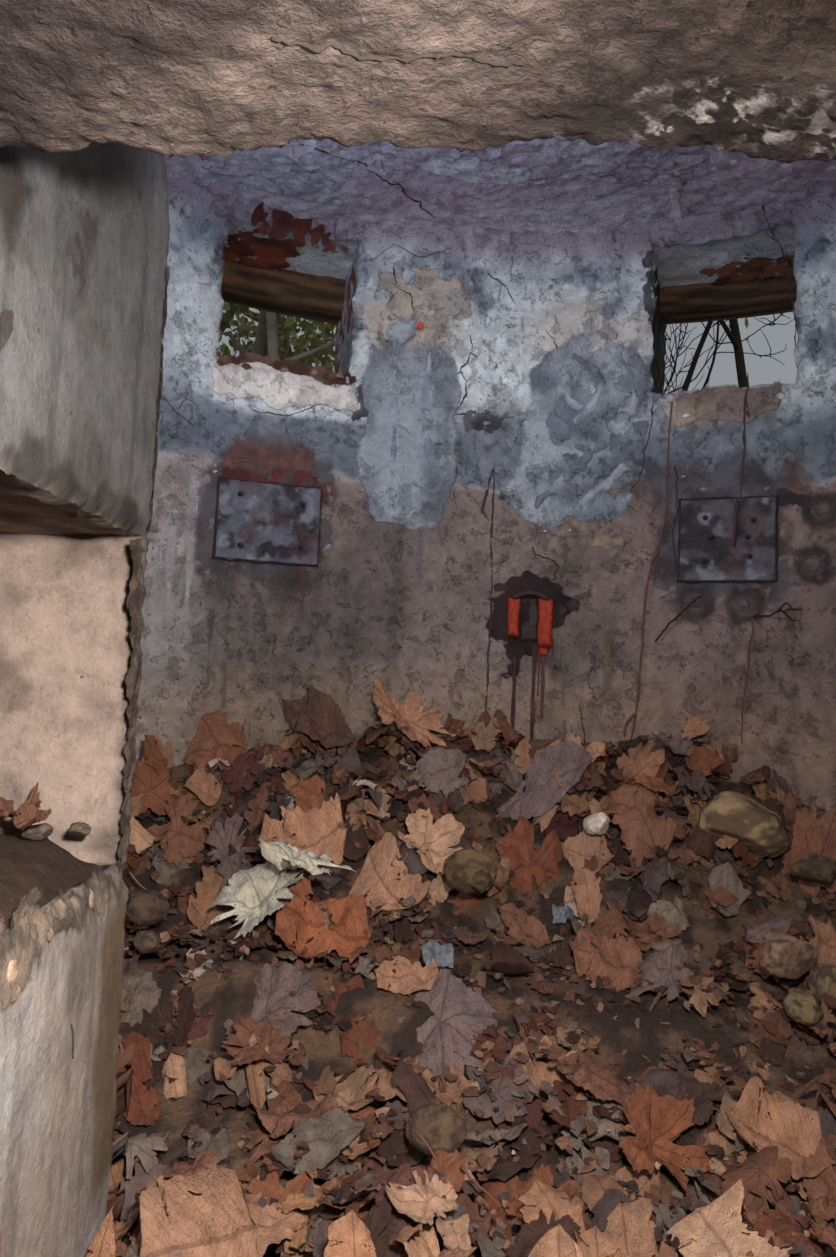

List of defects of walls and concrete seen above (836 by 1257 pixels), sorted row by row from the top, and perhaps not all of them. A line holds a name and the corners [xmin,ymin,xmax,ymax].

crack [271,35,524,67]
crack [288,142,435,218]
rust [223,202,349,271]
crack [363,244,451,311]
peeling [374,266,472,332]
rust [699,254,795,286]
peeling [212,352,369,421]
spalling [461,409,508,433]
peeling [675,380,782,427]
peeling [192,454,337,588]
peeling [645,453,795,602]
spalling [0,266,170,1011]